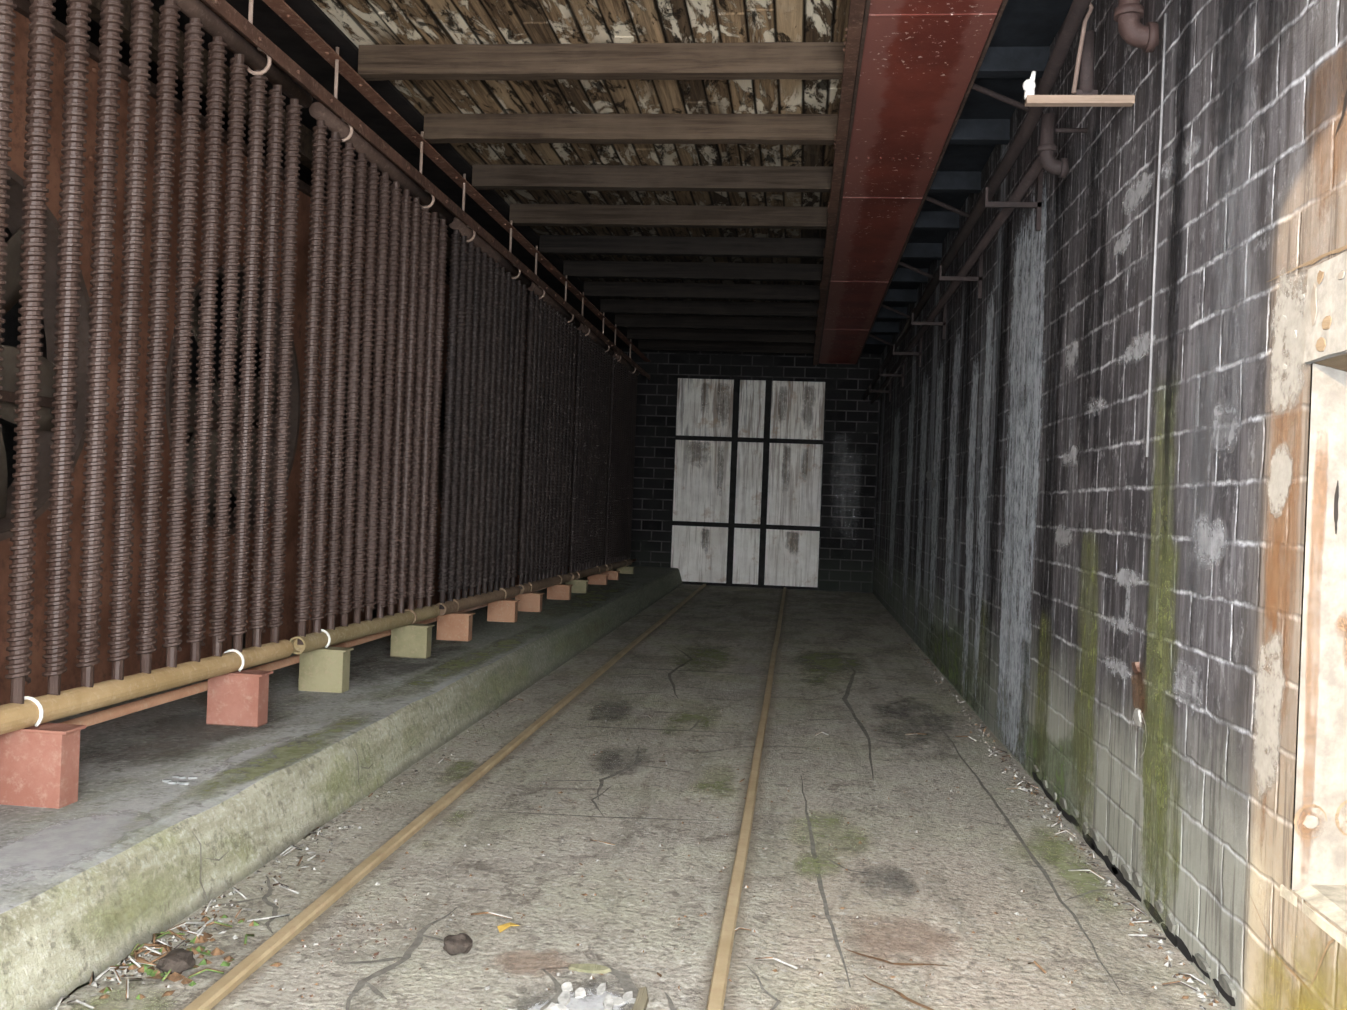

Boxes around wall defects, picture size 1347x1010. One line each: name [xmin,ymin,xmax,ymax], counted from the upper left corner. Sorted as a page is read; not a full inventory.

damp [879,0,1200,910]
efflorescence [1212,404,1238,451]
efflorescence [1194,518,1225,565]
crack [801,651,1123,996]
crack [346,907,457,1010]